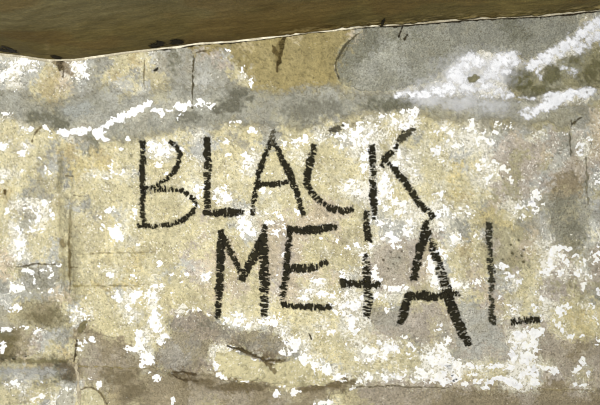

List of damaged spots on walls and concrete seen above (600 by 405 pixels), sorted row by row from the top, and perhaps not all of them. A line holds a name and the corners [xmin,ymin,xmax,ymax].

water stain [0,16,600,143]
crack [143,10,600,109]
peeling [96,206,125,246]
flaking render [111,106,600,405]
water stain [0,330,356,405]
crack [227,345,286,374]